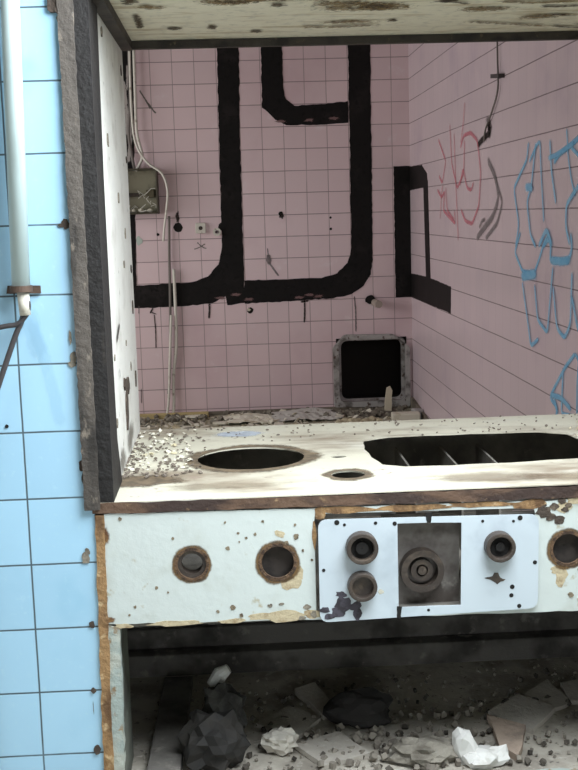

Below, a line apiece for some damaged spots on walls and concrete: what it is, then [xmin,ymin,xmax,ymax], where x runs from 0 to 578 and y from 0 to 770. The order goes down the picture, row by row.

peeling [312,498,578,549]
corrosion [172,545,212,583]
corrosion [256,540,300,584]
peeling [281,566,303,590]
corrosion [547,528,578,570]
peeling [216,591,362,623]